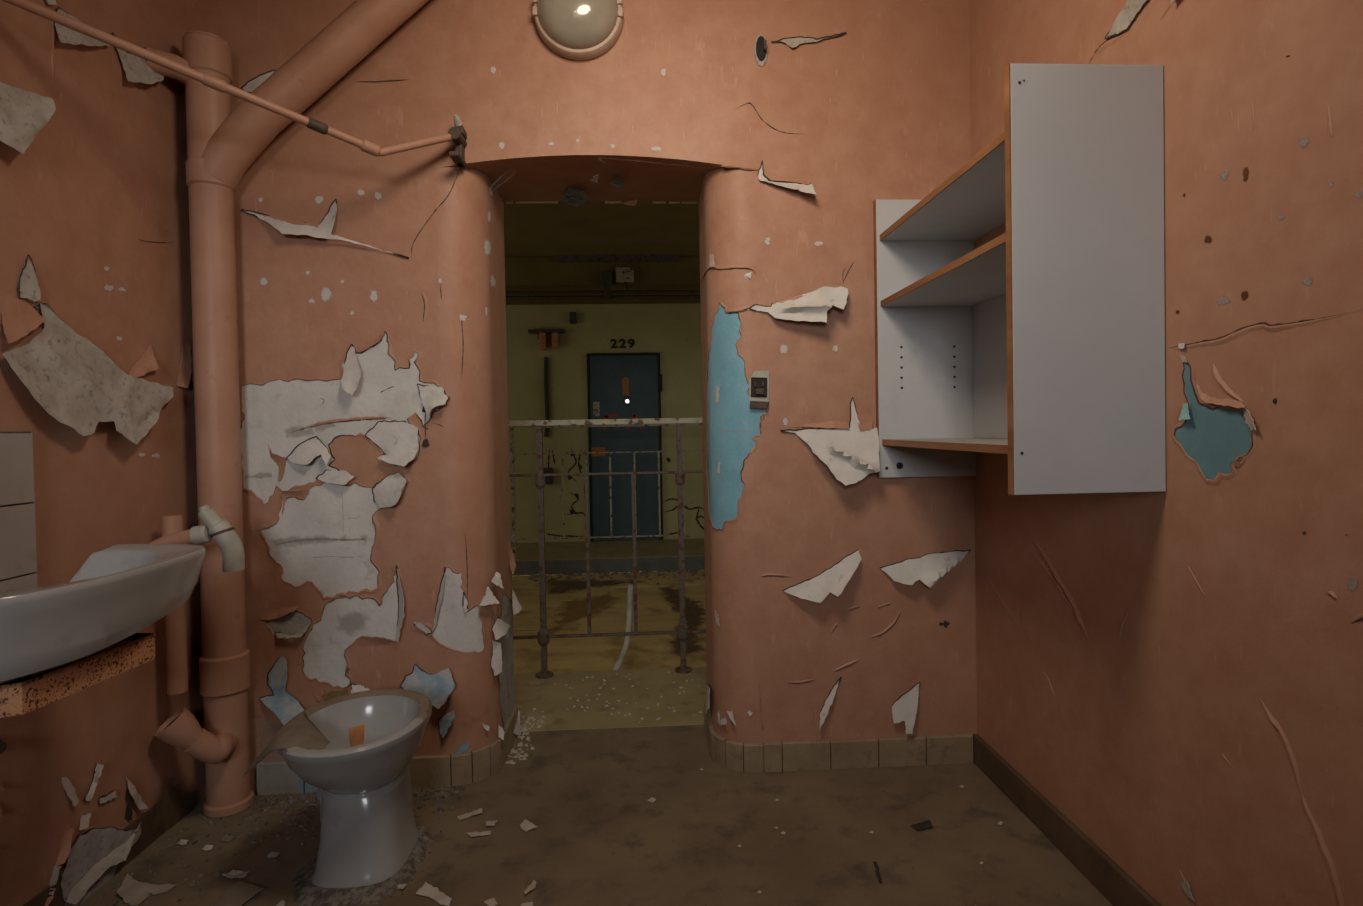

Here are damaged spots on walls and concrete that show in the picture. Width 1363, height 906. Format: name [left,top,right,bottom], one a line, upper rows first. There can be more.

peeling [0,0,165,154]
peeling [0,254,192,458]
peeling [706,262,880,532]
peeling [1171,355,1256,486]
crack [1168,309,1363,349]
spalling [240,329,522,740]
peeling [783,549,861,603]
peeling [880,549,971,588]
peeling [819,677,842,730]
peeling [892,682,920,734]